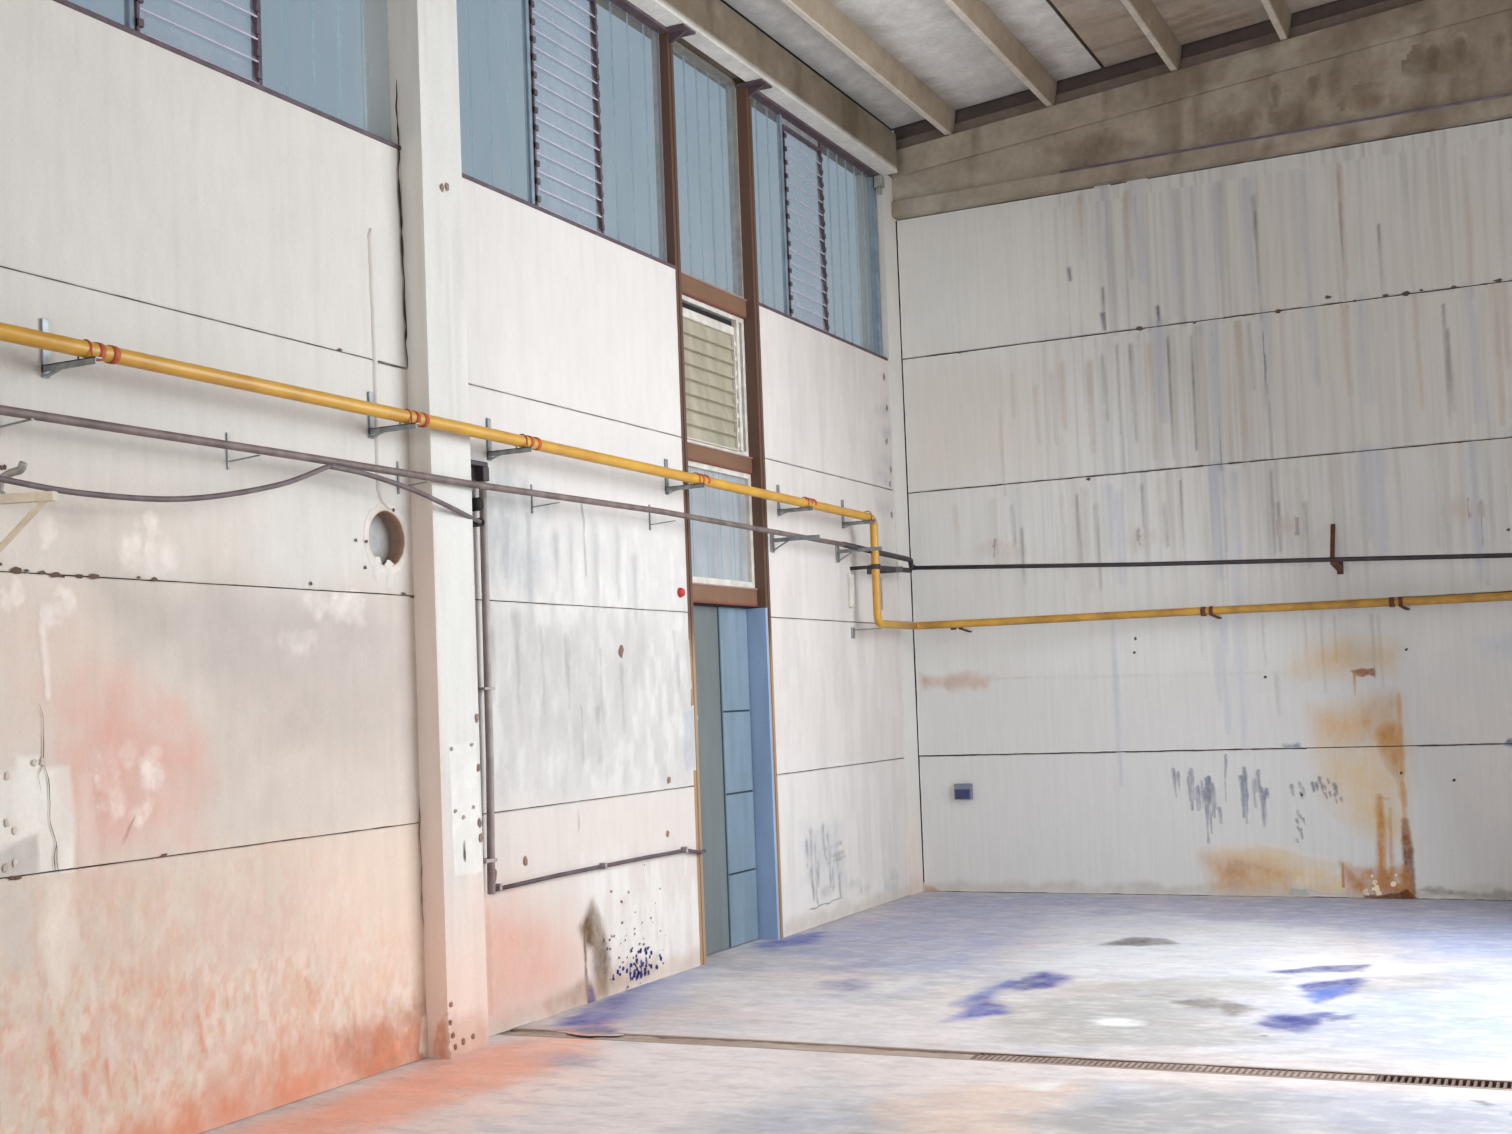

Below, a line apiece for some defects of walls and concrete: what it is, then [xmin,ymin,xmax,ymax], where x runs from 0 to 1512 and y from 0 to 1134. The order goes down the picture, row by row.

crack [38,704,59,871]
corrosion [1194,627,1423,899]
leakage [241,895,732,1134]